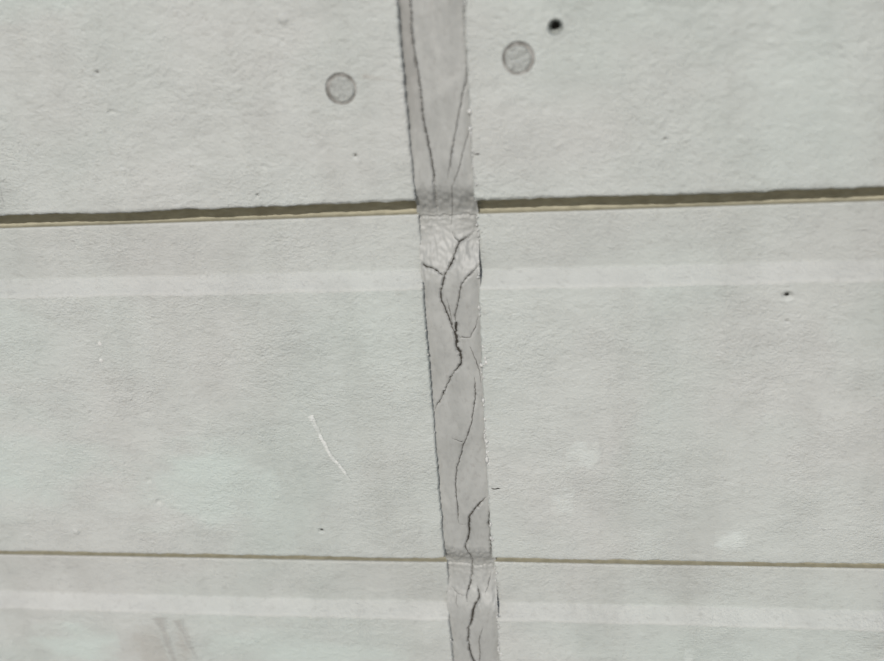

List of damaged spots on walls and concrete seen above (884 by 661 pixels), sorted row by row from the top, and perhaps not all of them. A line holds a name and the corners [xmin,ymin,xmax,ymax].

crack [410,0,492,661]